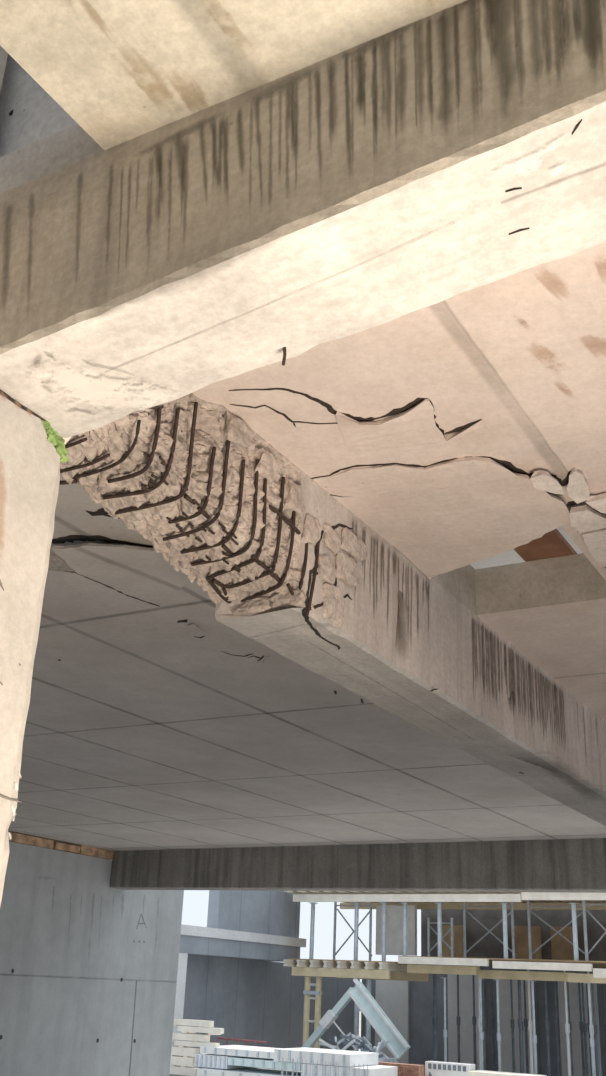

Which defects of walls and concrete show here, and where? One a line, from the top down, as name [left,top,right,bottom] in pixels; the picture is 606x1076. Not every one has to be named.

leakage [201,124,228,189]
leakage [316,66,334,162]
leakage [346,37,403,156]
leakage [418,11,458,118]
leakage [470,0,595,103]
crack [48,508,188,607]
spalling [31,355,368,629]
leakage [352,523,429,632]
crack [229,388,606,650]
leakage [472,619,565,737]